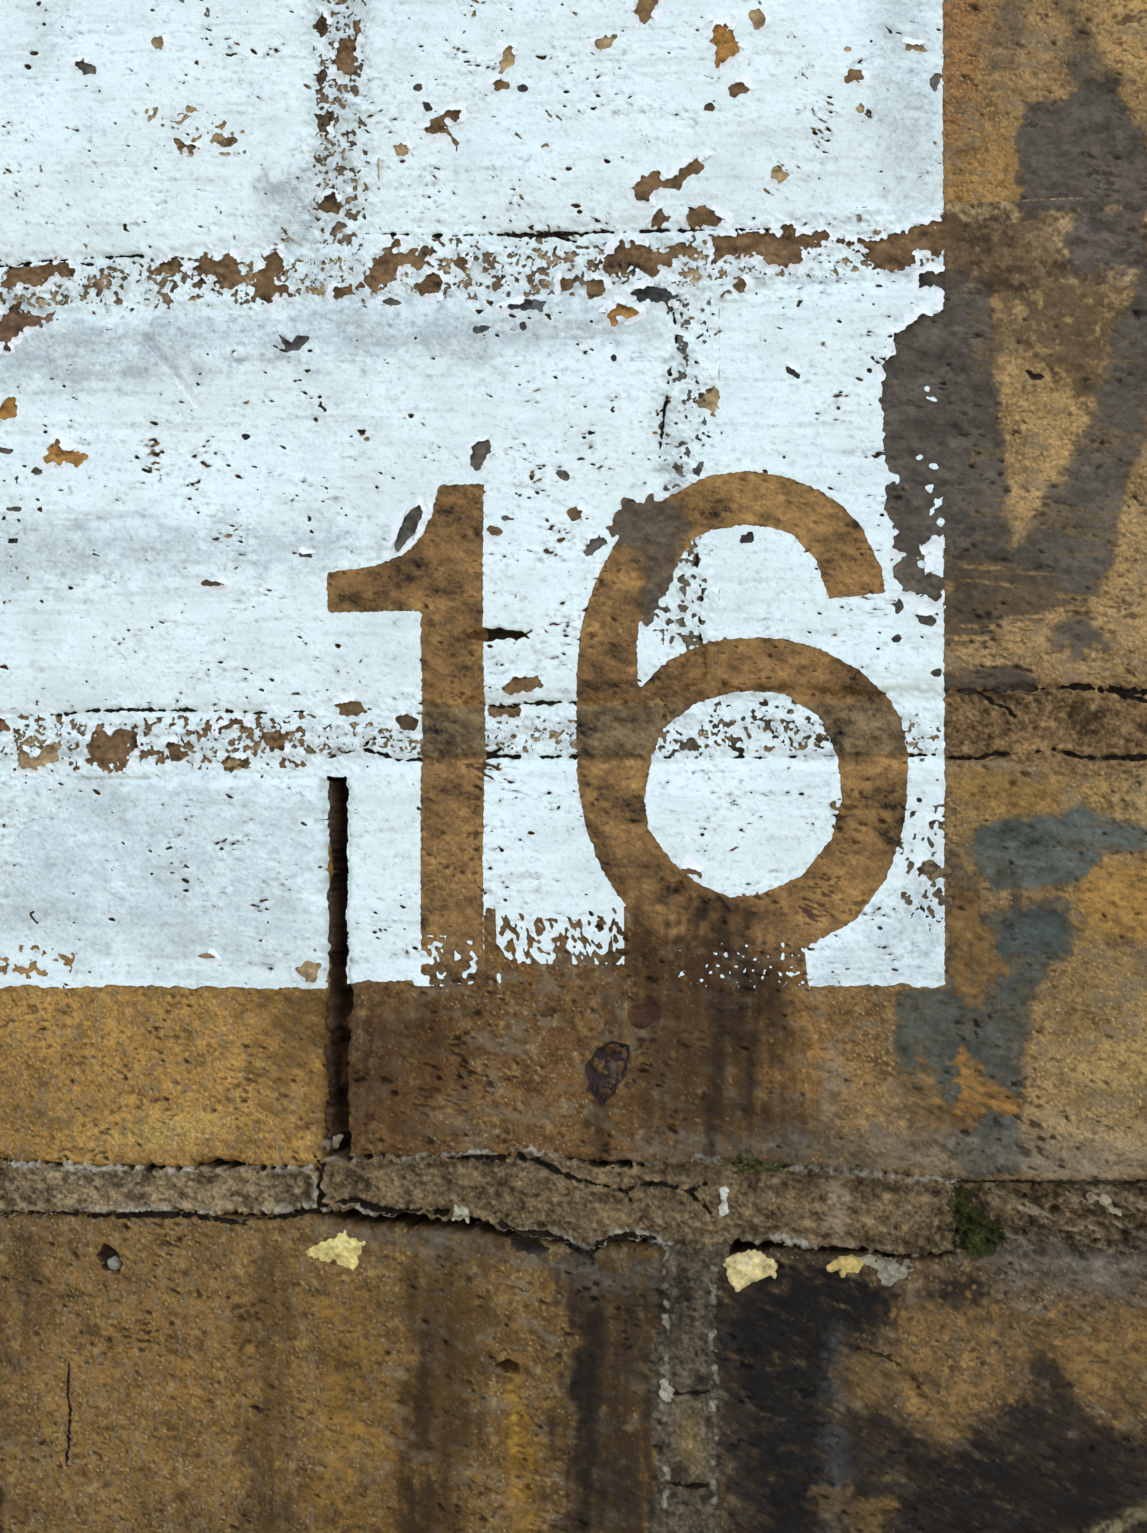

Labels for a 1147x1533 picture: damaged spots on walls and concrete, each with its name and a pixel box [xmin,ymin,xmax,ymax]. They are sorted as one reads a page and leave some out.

peeling [145,105,246,158]
peeling [0,242,294,356]
peeling [313,0,973,492]
peeling [886,493,971,626]
peeling [0,701,312,779]
peeling [488,666,544,725]
crack [885,683,1147,762]
peeling [0,945,77,979]
crack [0,1152,712,1266]
crack [951,1178,1147,1186]
damp [391,1244,488,1533]
damp [548,1241,681,1533]